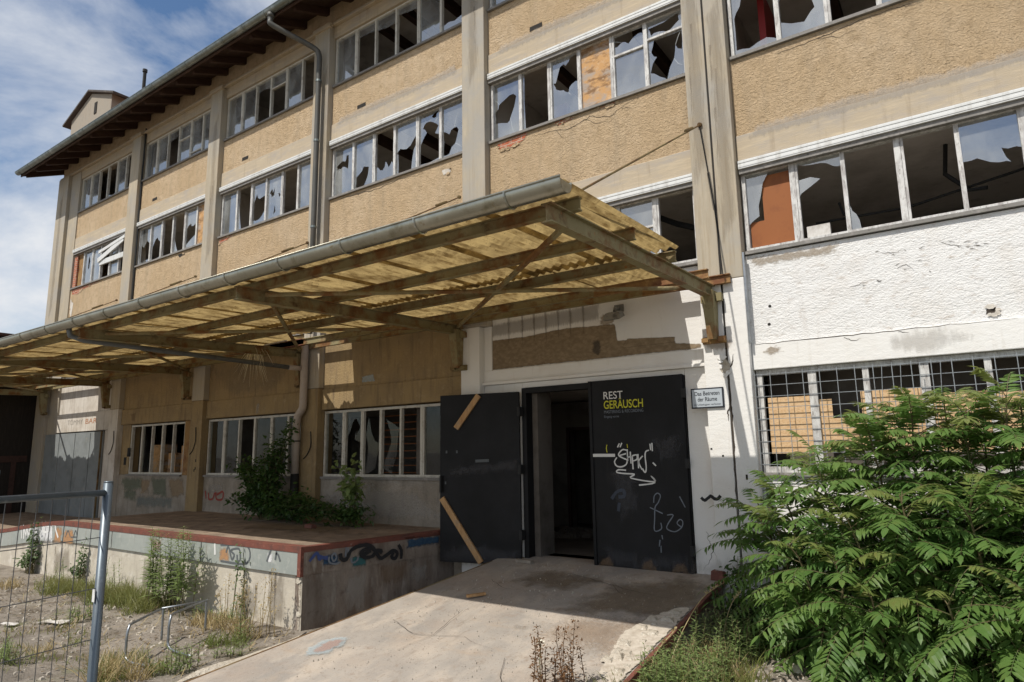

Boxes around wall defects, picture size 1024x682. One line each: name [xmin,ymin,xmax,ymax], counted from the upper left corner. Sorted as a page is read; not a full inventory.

spalling [497,132,528,152]
spalling [985,304,1001,317]
peeling [493,325,701,370]